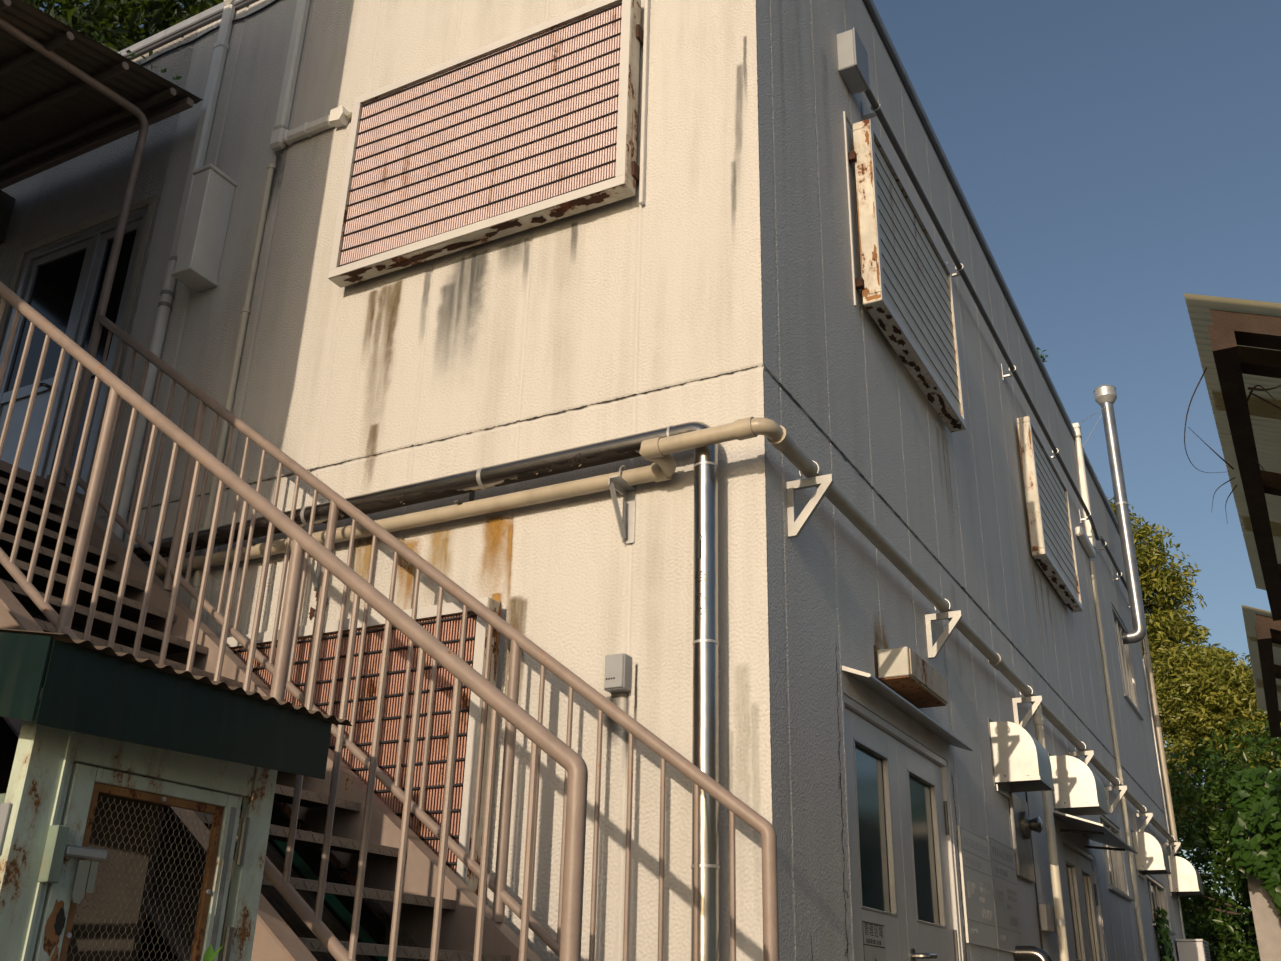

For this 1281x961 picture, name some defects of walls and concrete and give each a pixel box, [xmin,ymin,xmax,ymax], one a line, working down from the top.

corrosion [341,193,610,340]
corrosion [857,131,961,473]
corrosion [488,518,513,562]
corrosion [1027,508,1075,612]
crack [835,645,849,961]